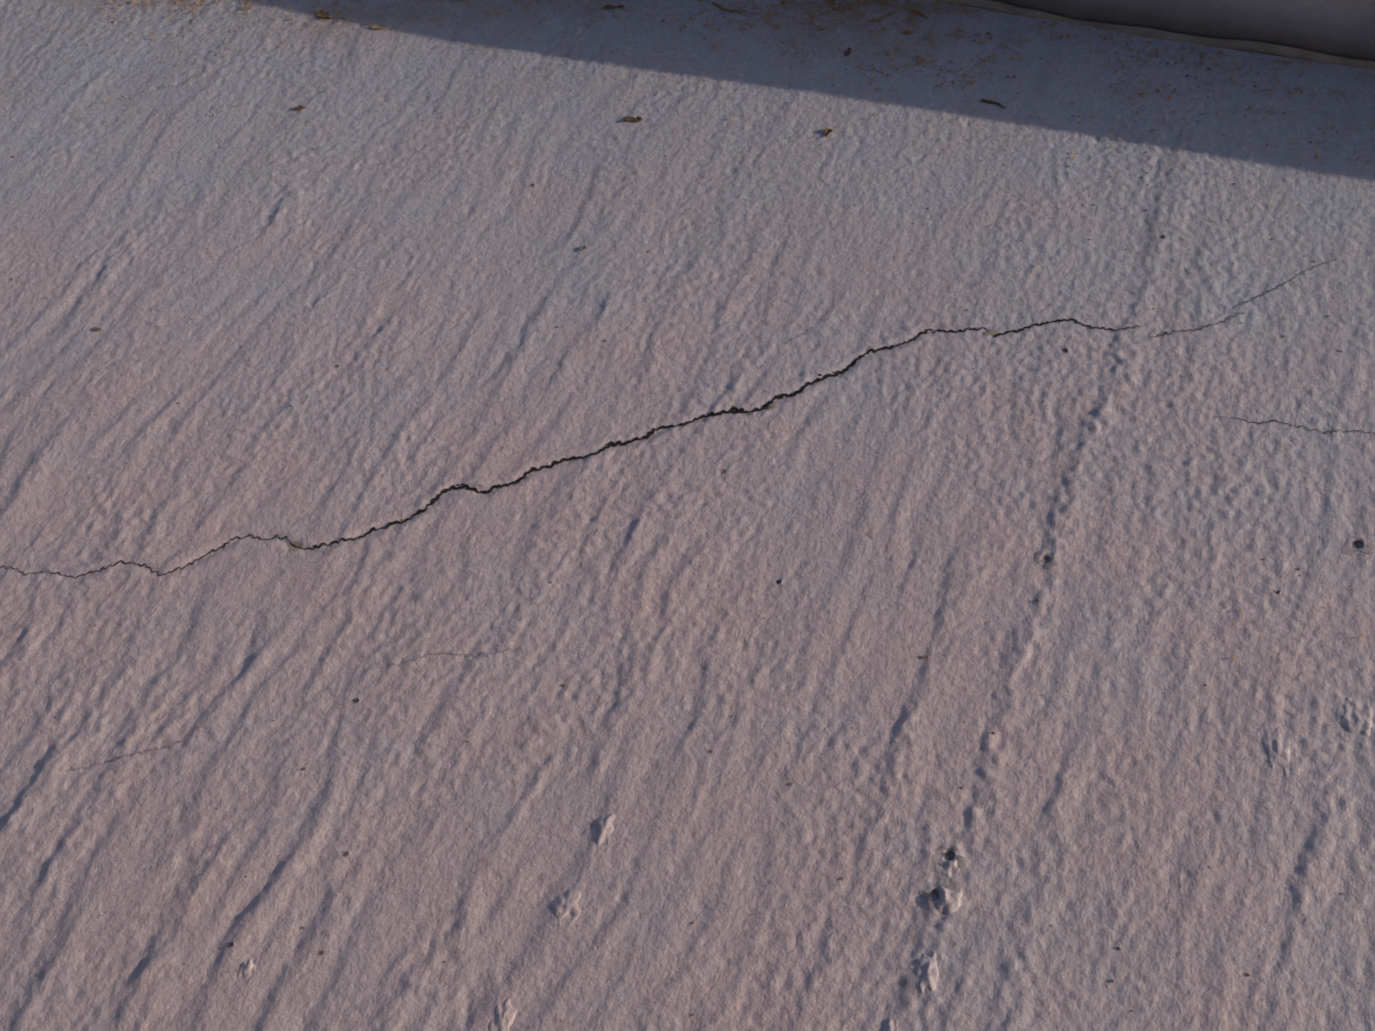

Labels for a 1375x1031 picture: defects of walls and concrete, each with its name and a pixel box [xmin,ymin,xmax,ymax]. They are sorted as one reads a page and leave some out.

crack [0,259,1335,578]